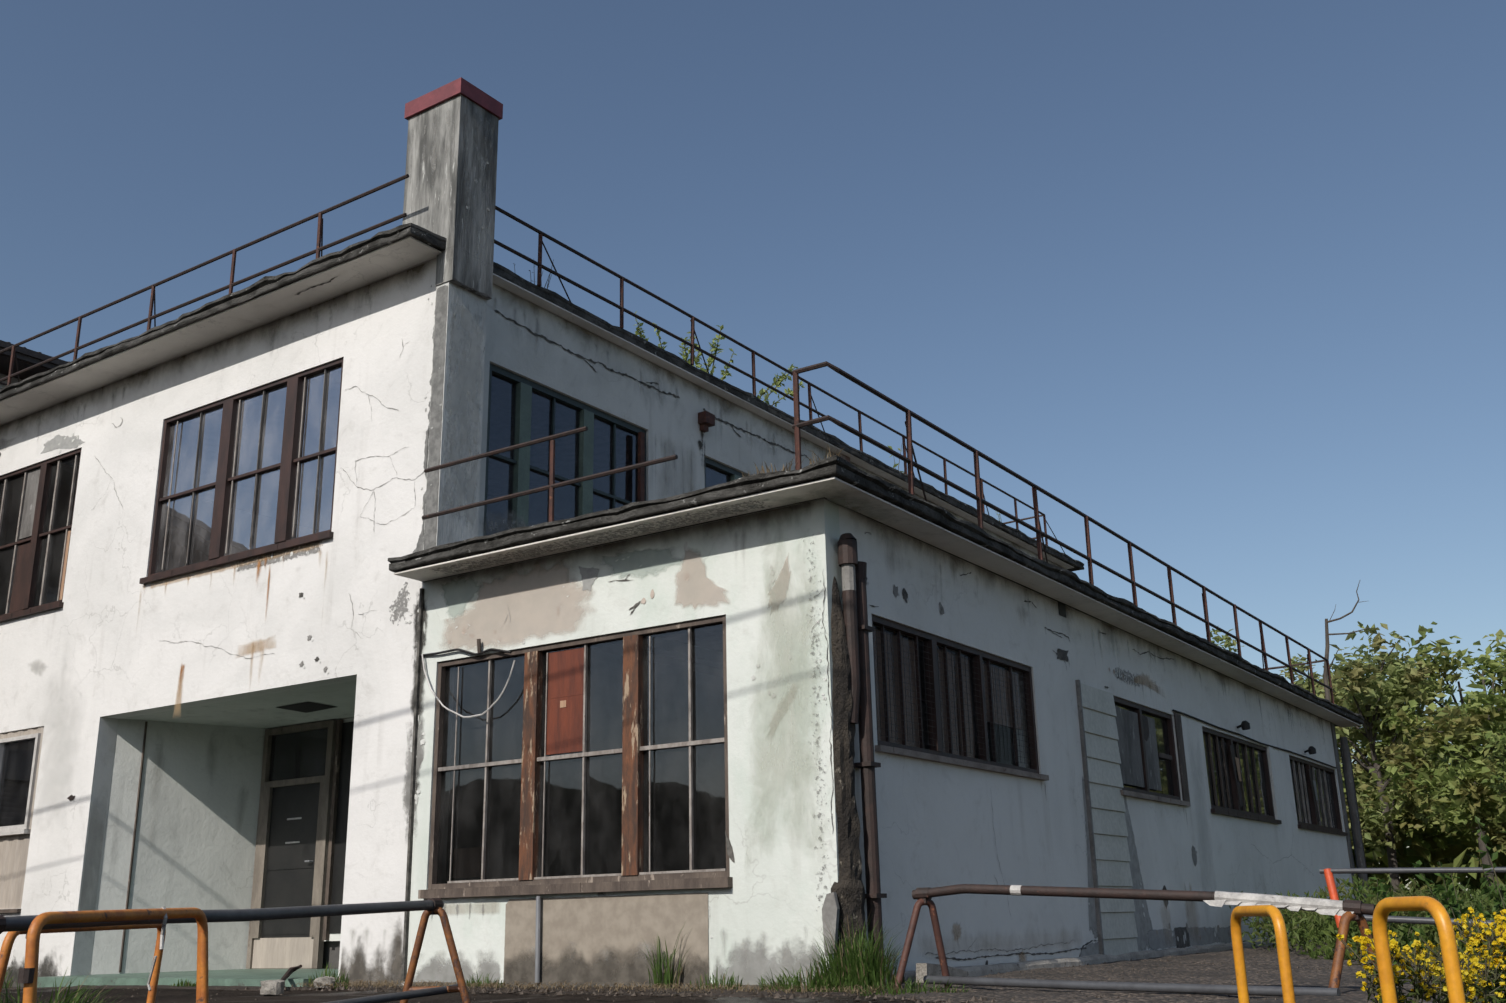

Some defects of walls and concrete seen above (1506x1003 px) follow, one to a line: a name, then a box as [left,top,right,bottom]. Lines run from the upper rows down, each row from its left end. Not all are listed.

crack [453,265,808,458]
crack [342,447,427,530]
peeling [389,499,769,649]
peeling [768,559,790,612]
water stain [411,604,427,726]
peeling [803,532,827,901]
water stain [3,957,57,987]